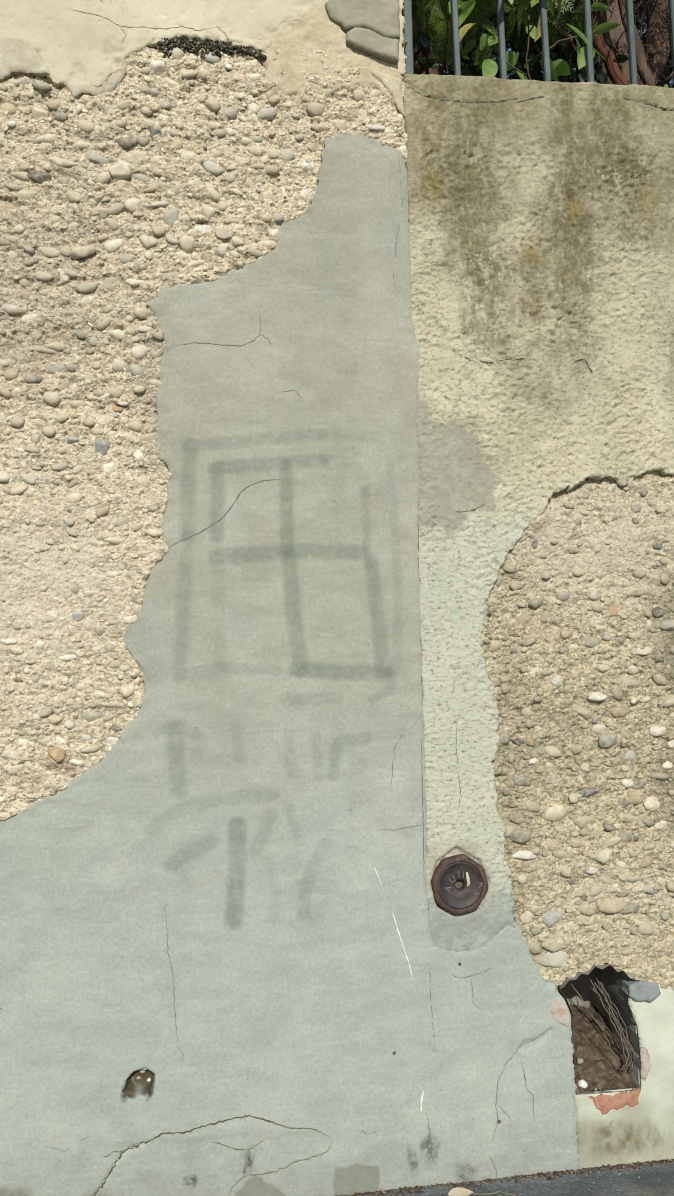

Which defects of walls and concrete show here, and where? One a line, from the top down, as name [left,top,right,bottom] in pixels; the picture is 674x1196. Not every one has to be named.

crack [66,0,228,43]
damp [454,108,495,285]
damp [554,88,642,232]
crack [626,99,674,111]
spalling [0,0,408,821]
spalling [474,471,674,994]
crack [48,1115,333,1196]